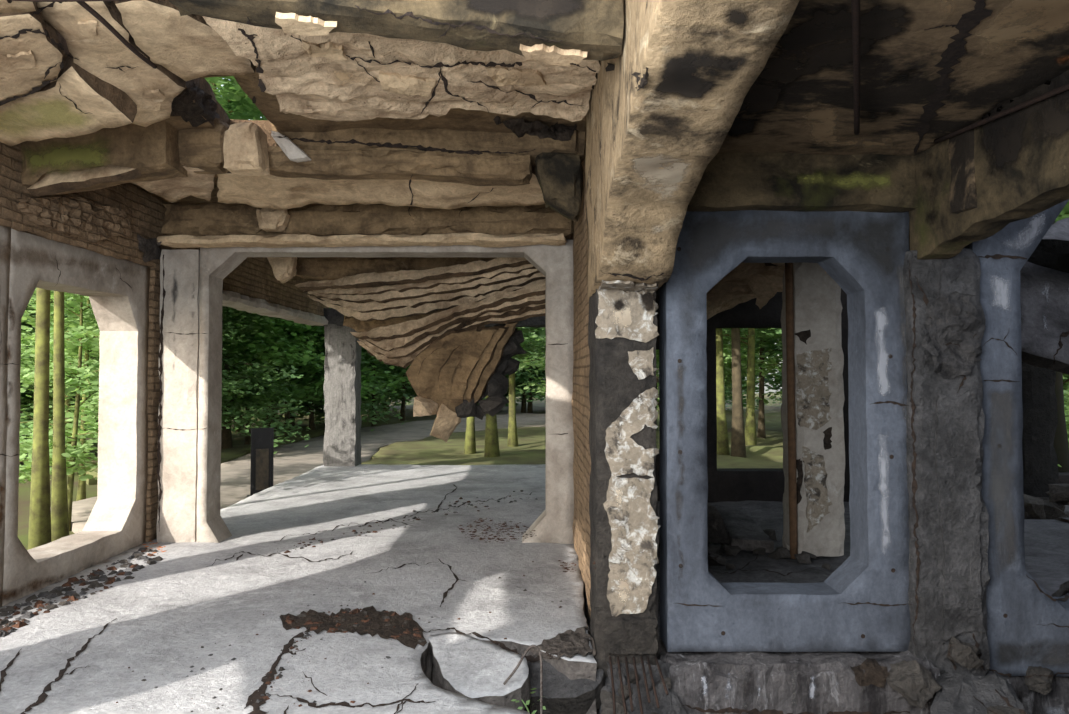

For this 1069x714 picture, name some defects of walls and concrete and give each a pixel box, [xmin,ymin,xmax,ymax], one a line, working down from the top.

crack [0,2,93,114]
crack [238,16,266,103]
crack [346,5,596,115]
damp [654,50,746,99]
damp [727,3,915,138]
damp [979,0,1069,48]
damp [979,72,1069,173]
damp [996,279,1008,308]
flaking render [595,280,661,616]
flaking render [795,330,833,532]
crack [20,618,117,714]
crack [244,628,435,714]